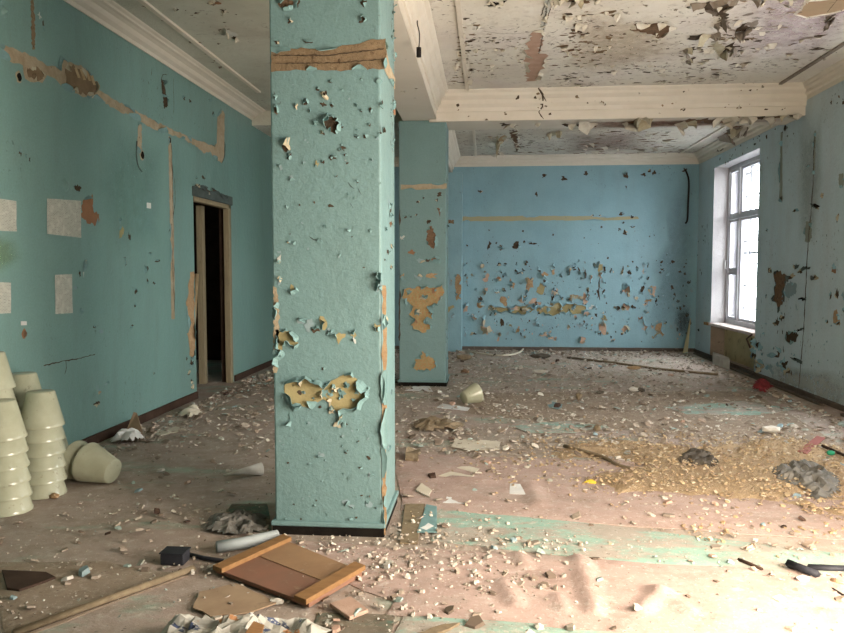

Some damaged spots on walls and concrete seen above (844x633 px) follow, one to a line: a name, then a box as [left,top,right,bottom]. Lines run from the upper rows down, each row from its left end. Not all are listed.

peeling [550,0,588,50]
spalling [777,0,844,39]
peeling [161,79,169,109]
peeling [278,137,292,170]
peeling [700,104,767,165]
peeling [73,184,99,226]
peeling [186,271,196,389]
peeling [750,264,844,376]
peeling [284,372,370,428]
peeling [372,220,699,535]